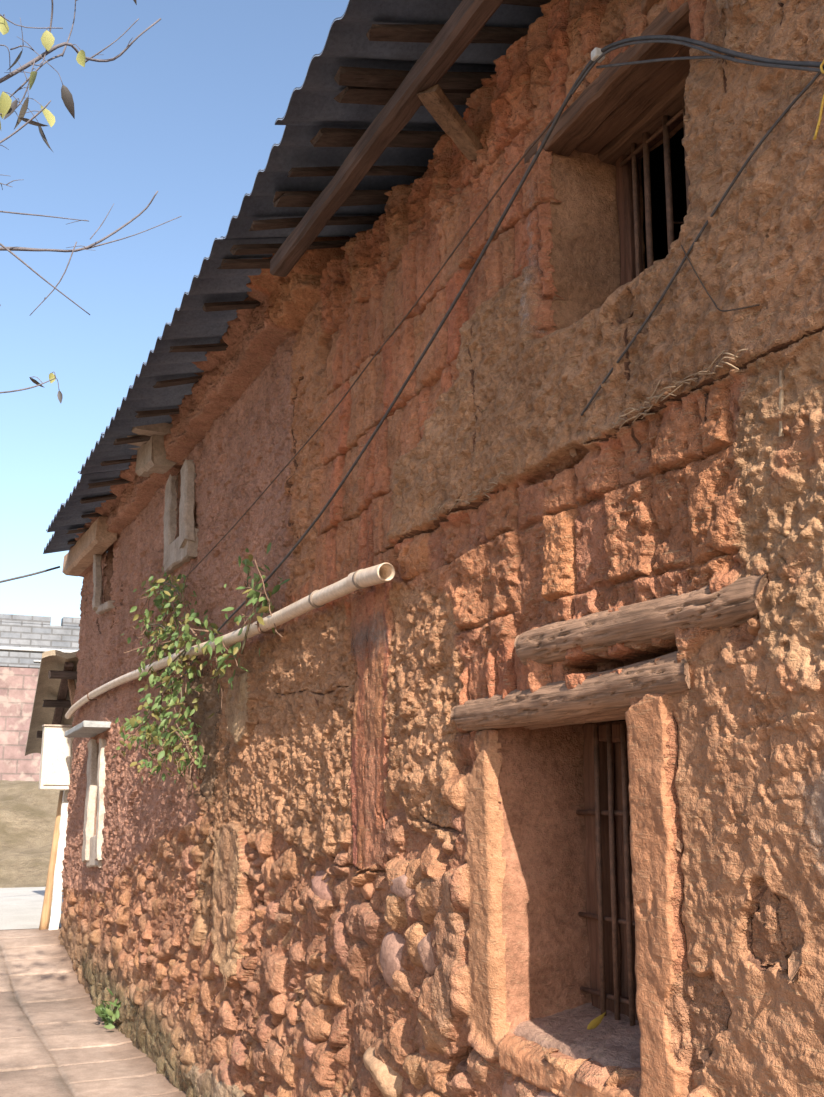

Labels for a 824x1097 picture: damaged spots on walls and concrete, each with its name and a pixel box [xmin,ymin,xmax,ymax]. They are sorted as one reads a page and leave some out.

crack [468,324,481,451]
crack [586,288,824,453]
crack [386,482,518,550]
spalling [740,878,804,984]